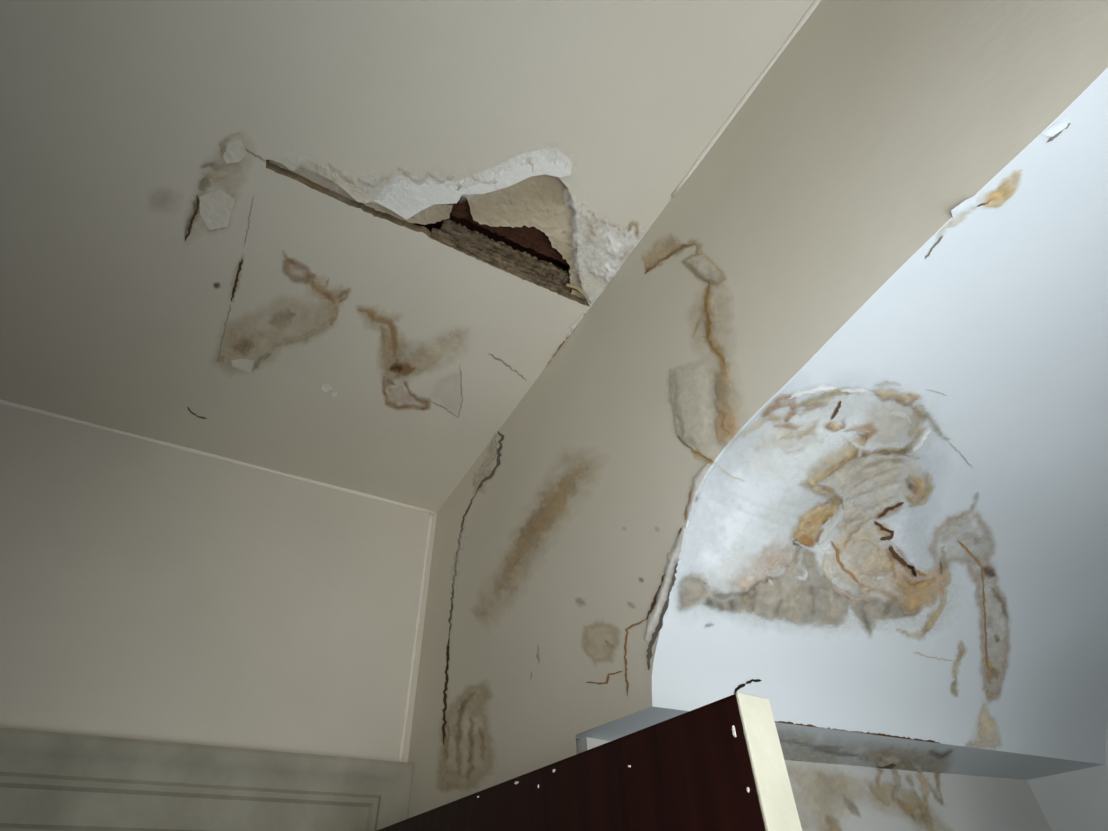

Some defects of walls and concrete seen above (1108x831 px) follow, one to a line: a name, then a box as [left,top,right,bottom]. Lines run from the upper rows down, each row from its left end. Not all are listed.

peeling [1041,119,1070,143]
peeling [185,139,266,241]
peeling [951,173,1018,218]
flaking render [563,200,644,303]
flaking render [644,244,693,274]
damp [231,276,347,374]
crack [442,431,504,744]
damp [503,468,583,586]
crack [586,436,745,696]